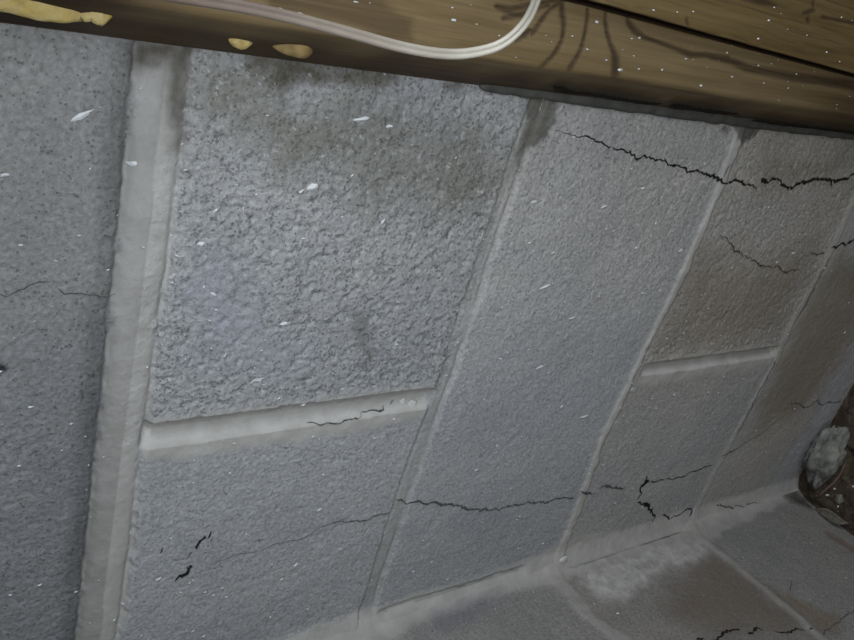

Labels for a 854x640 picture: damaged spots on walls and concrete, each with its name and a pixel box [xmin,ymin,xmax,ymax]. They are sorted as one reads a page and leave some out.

water stain [522,98,556,149]
crack [552,85,854,134]
crack [556,130,854,190]
crack [212,361,842,565]
crack [697,610,854,640]